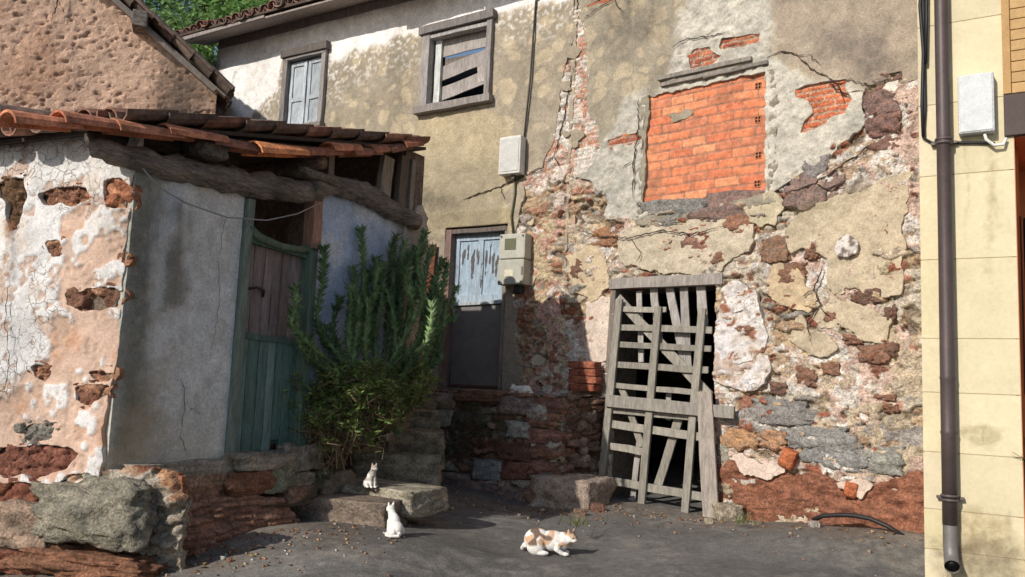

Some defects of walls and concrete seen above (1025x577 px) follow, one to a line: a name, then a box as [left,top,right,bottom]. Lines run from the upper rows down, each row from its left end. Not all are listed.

flaking render [687,34,760,68]
crack [466,0,626,199]
flaking render [532,0,641,184]
flaking render [795,80,851,133]
crack [624,99,639,195]
spalling [0,172,28,230]
spalling [43,182,92,207]
spalling [42,236,66,257]
spalling [65,282,136,311]
crack [804,269,829,346]
spalling [73,365,125,409]
spalling [0,420,79,502]